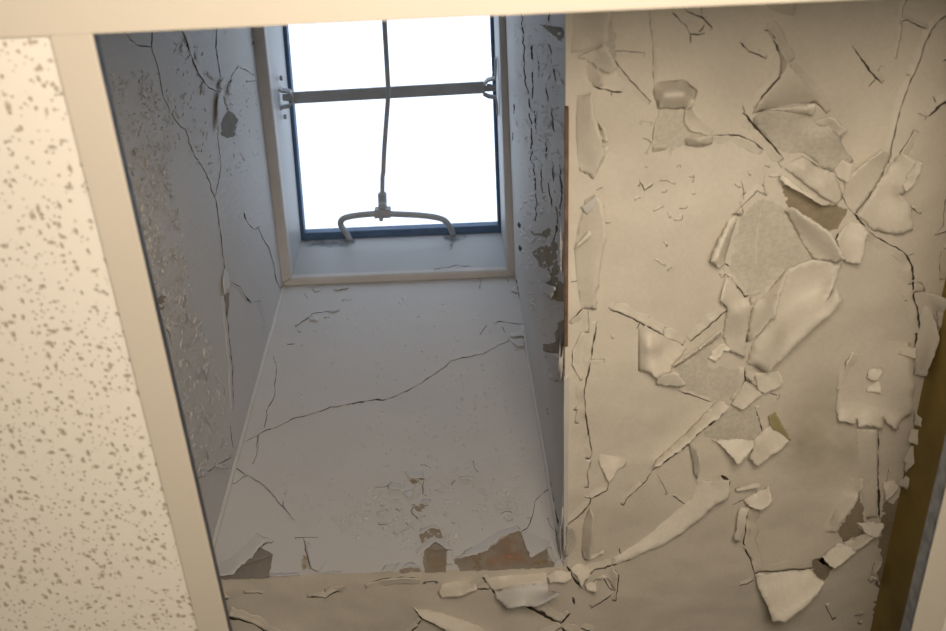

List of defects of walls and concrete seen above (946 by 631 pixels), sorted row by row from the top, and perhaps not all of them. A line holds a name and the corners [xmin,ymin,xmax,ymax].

peeling [201,72,238,138]
crack [126,28,282,328]
peeling [220,269,234,410]
peeling [376,11,946,625]
crack [197,338,510,520]
crack [229,590,280,631]
crack [525,549,631,631]